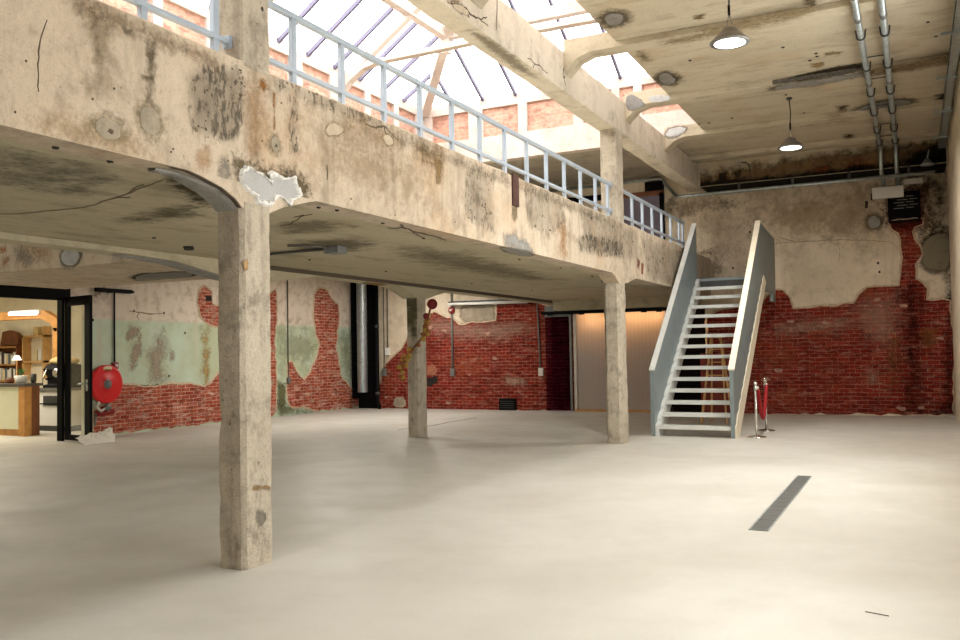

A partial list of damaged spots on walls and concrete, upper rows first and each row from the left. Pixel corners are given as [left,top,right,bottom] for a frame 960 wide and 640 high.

crack [447,2,498,29]
crack [37,20,47,92]
crack [0,180,163,214]
crack [388,224,446,240]
damp [700,134,949,247]
flaking render [92,327,221,433]
flaking render [196,284,219,328]
flaking render [270,286,359,416]
flaking render [379,337,408,409]
flaking render [426,302,575,411]
flaking render [704,307,739,366]
flaking render [744,217,955,415]